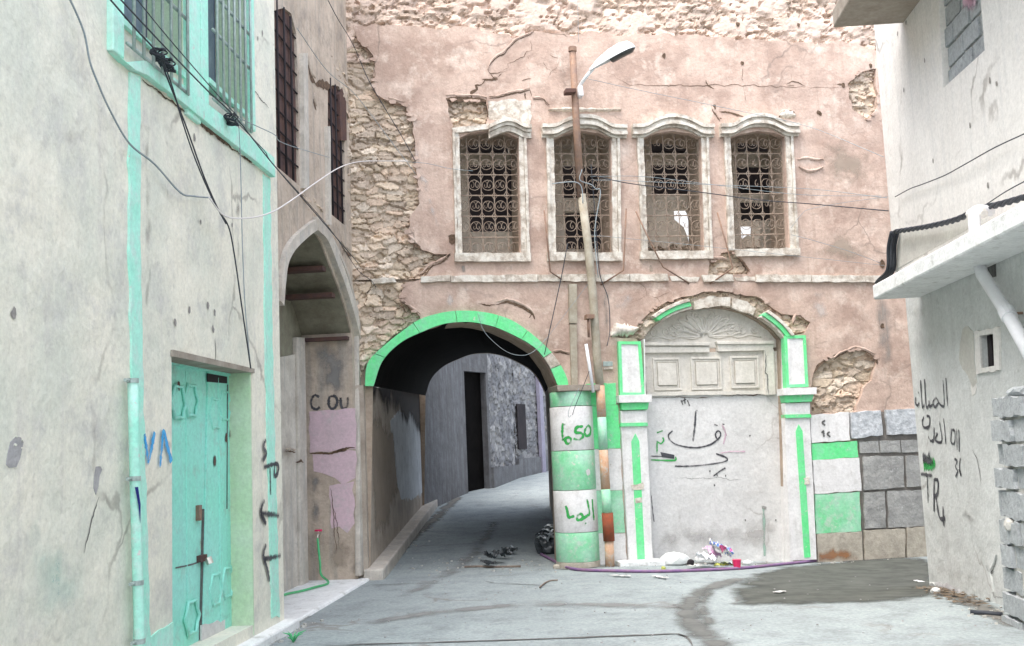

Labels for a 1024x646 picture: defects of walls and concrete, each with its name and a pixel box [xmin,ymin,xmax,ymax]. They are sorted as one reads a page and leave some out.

spalling [448,98,532,128]
crack [446,30,566,114]
spalling [842,63,880,121]
spalling [334,42,455,377]
spalling [611,289,808,339]
spalling [811,348,879,414]
crack [285,447,355,463]
crack [330,488,339,551]